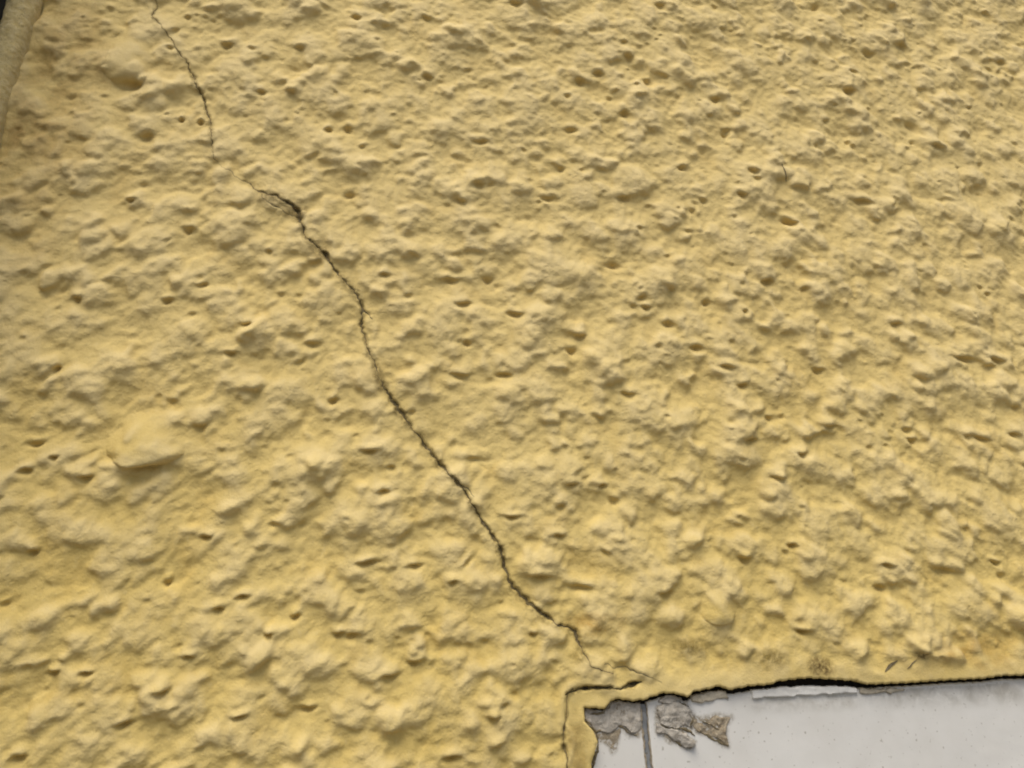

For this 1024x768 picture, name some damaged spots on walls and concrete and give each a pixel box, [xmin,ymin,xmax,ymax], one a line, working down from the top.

crack [152,5,660,768]
peeling [750,685,905,699]
spalling [690,714,731,747]